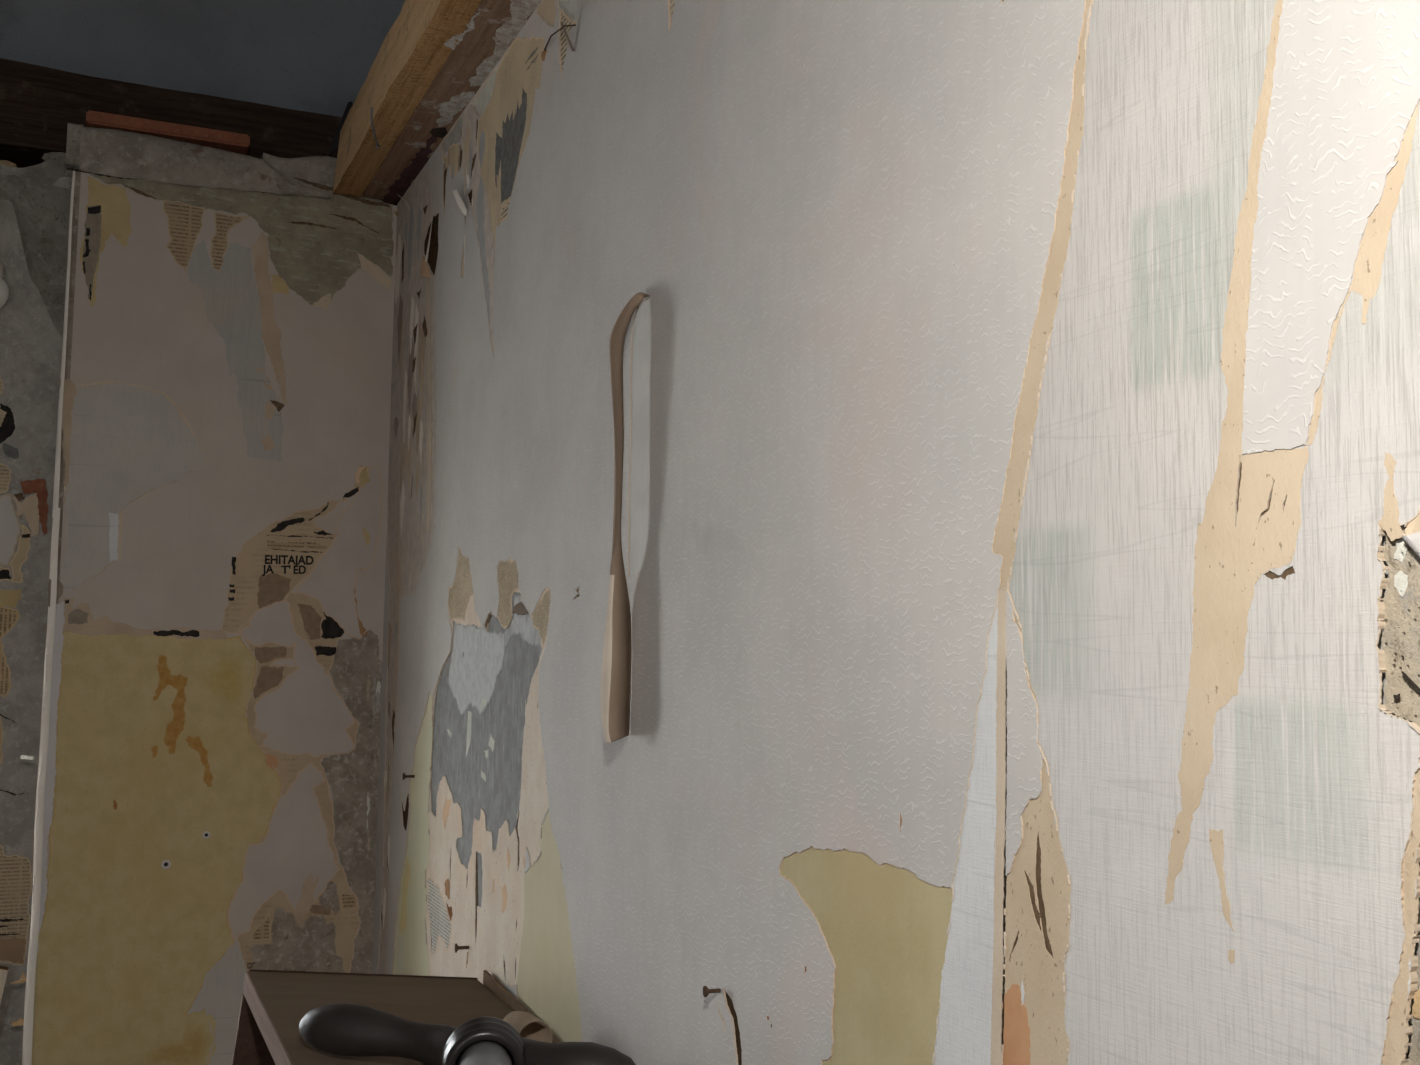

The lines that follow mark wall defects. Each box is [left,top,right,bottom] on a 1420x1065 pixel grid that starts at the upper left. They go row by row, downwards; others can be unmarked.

flaking render [65,123,394,310]
peeling [442,68,500,354]
flaking render [0,479,48,697]
peeling [990,0,1092,1065]
peeling [1164,0,1420,905]
peeling [33,597,228,966]
flaking render [247,630,382,974]
flaking render [431,592,542,907]
flaking render [1383,769,1420,1065]